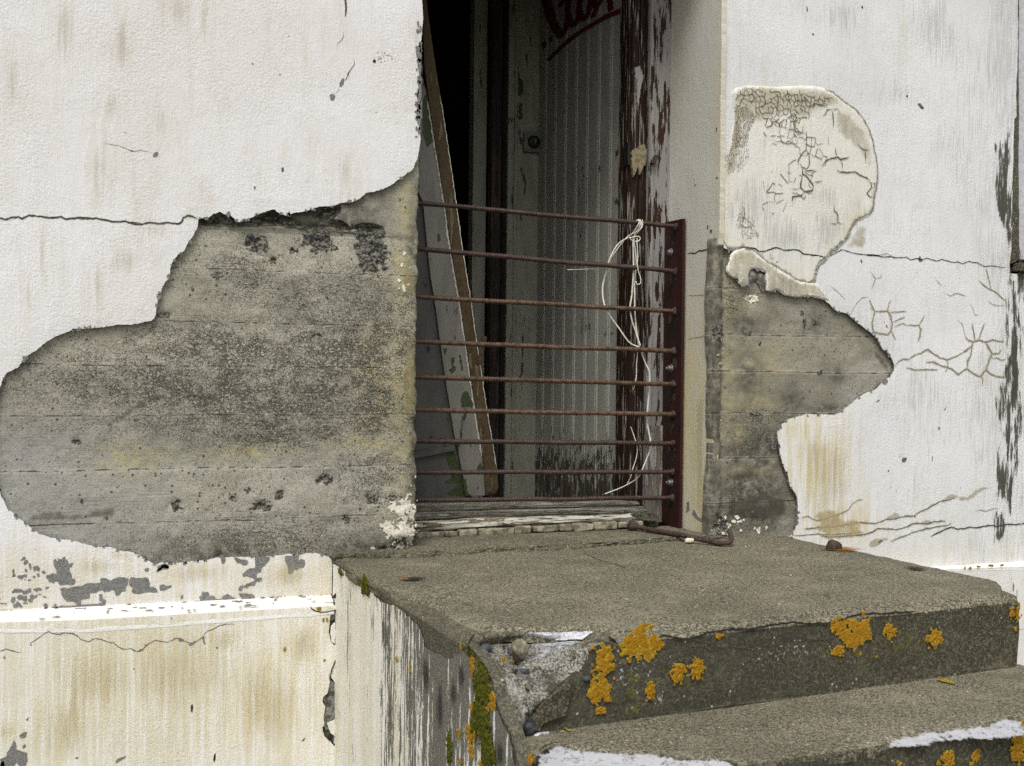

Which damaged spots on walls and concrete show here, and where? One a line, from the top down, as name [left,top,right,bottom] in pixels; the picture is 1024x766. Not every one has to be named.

crack [0,214,197,225]
spalling [0,157,419,619]
spalling [686,225,893,538]
crack [738,247,1005,384]
leakage [994,132,1024,540]
crack [795,488,1024,547]
crack [1,623,235,652]
spalling [466,630,610,752]
crack [658,611,916,650]